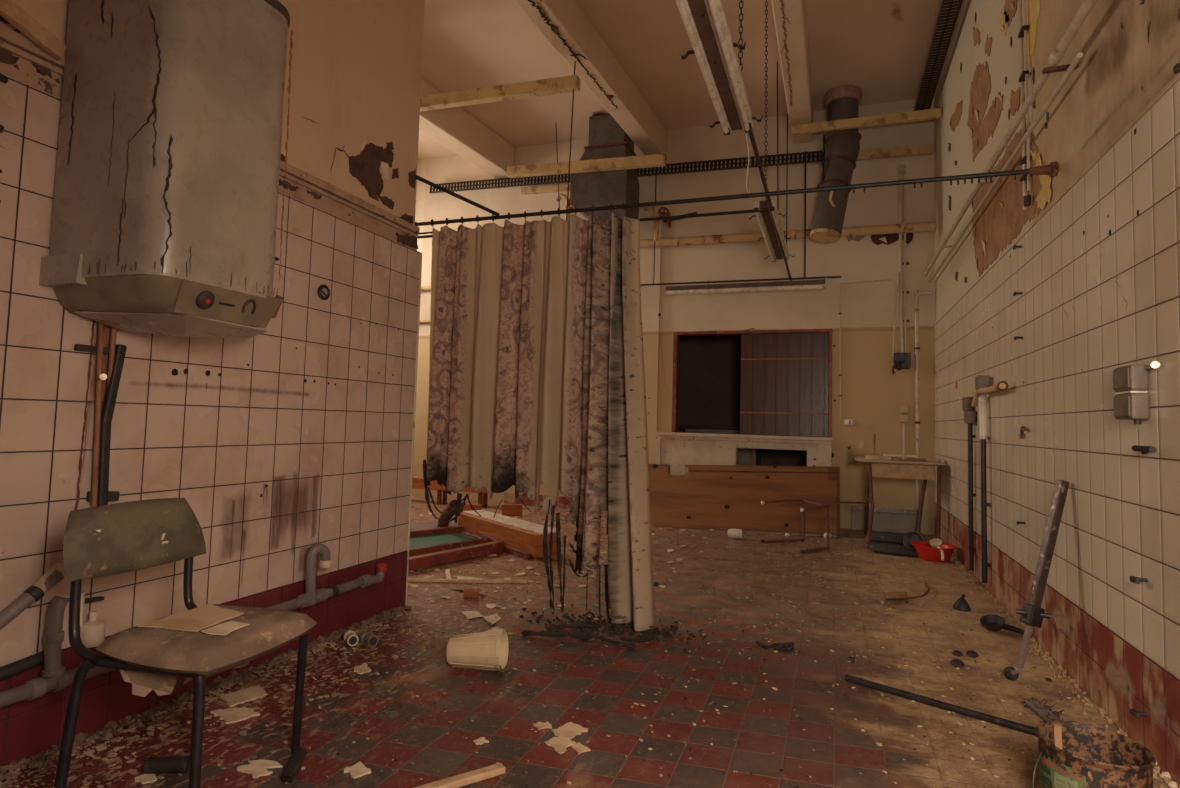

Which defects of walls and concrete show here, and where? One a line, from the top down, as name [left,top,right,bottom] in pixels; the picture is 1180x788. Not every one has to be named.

peeling [348,141,418,249]
peeling [948,0,1051,283]
peeling [1105,662,1134,709]